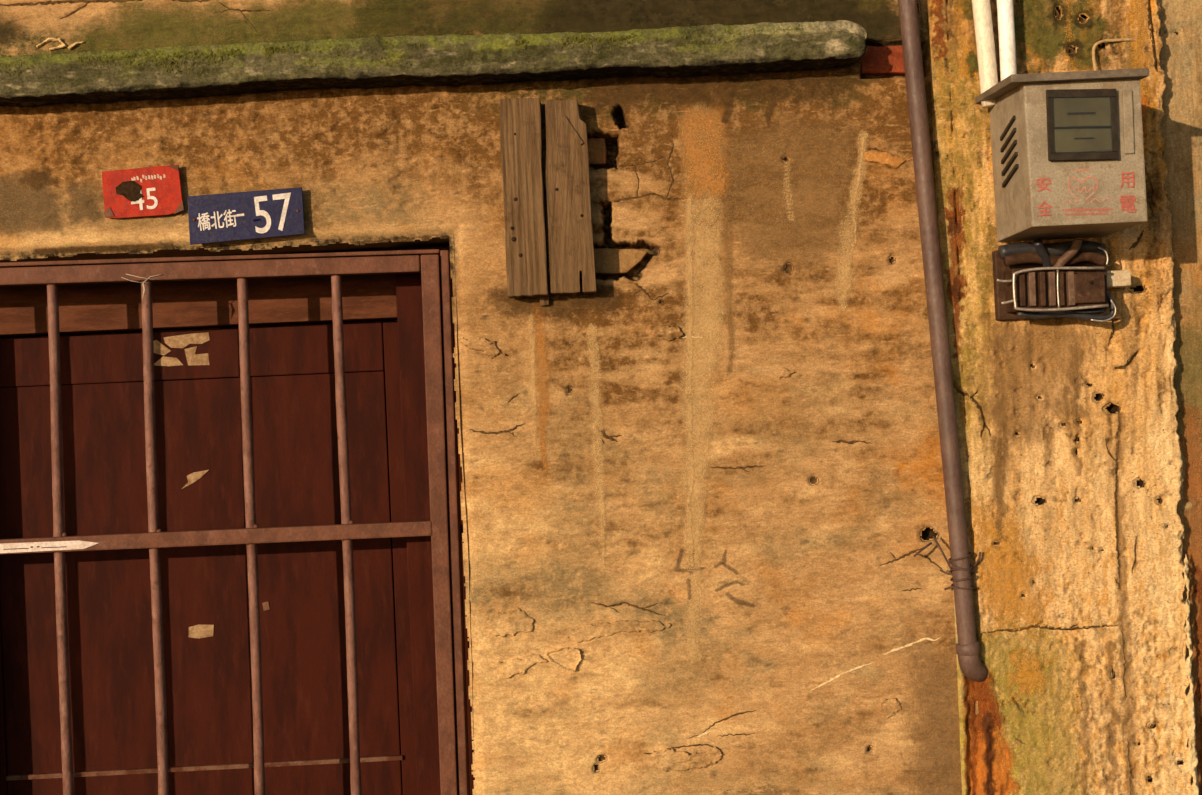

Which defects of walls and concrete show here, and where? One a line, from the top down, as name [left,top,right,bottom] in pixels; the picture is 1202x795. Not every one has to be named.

water stain [36,38,85,51]
water stain [540,0,902,46]
spalling [588,138,607,167]
spalling [580,248,647,275]
corrosion [945,188,967,359]
crack [1105,408,1137,588]
water stain [1116,513,1126,582]
crack [983,621,1127,705]
water stain [1105,638,1131,683]
corrosion [963,661,1019,795]
water stain [1106,703,1135,795]